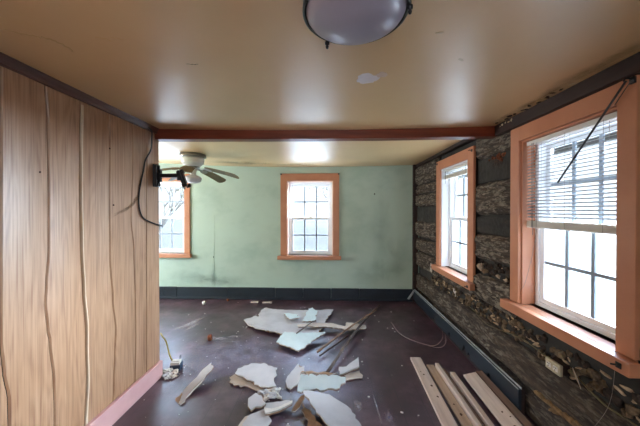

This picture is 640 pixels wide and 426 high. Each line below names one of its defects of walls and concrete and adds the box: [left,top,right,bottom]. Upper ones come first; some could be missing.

peeling [357,72,388,84]
peeling [420,280,502,356]
spalling [533,390,582,426]